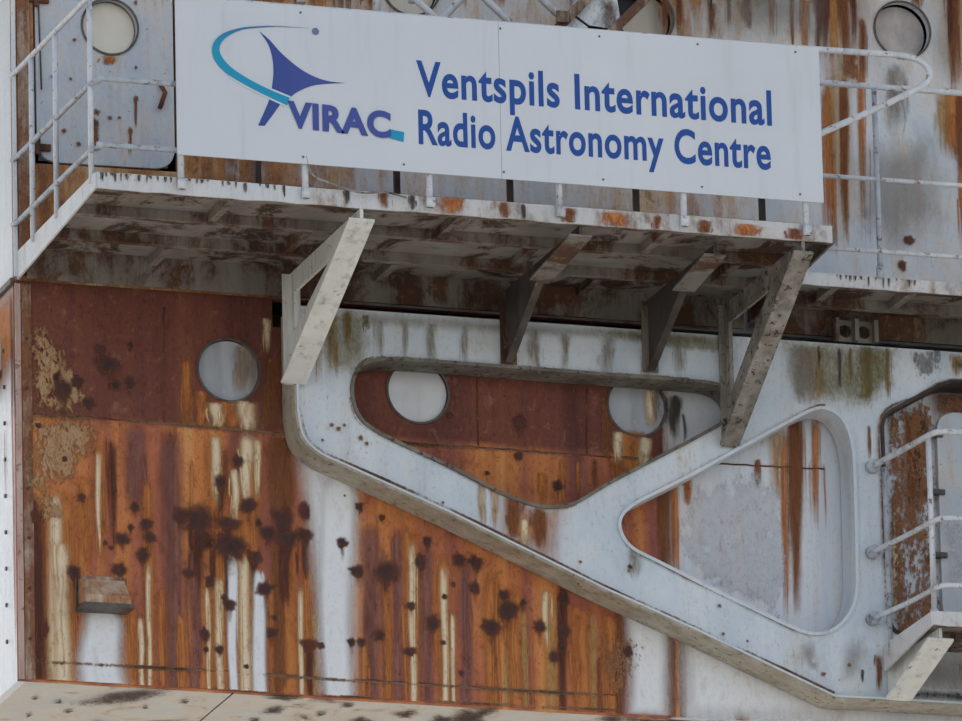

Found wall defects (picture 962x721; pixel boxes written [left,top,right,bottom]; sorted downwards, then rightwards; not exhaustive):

rust [708,0,751,32]
rust [947,0,960,77]
rust [790,0,871,241]
rust [943,95,962,225]
peeling [28,322,99,521]
rust [645,390,686,440]
mould [797,347,892,400]
rust [31,318,651,714]
rust [781,404,826,605]
rust [868,359,962,632]
rust [745,640,835,694]
rust [874,655,882,685]